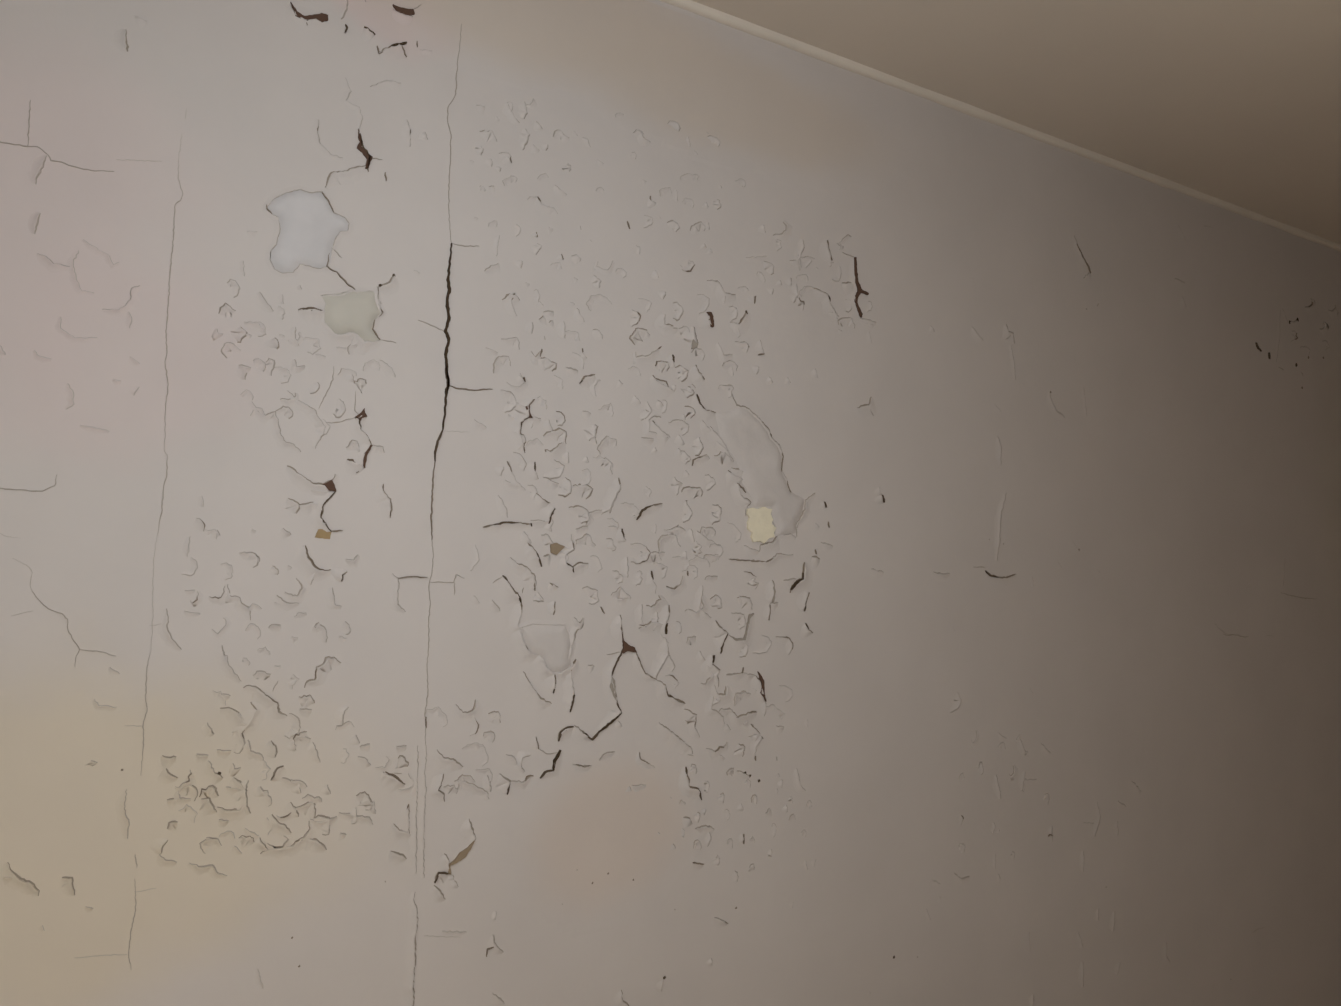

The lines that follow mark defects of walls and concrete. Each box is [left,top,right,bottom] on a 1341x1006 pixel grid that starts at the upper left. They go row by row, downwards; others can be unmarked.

spalling [286,0,433,62]
crack [0,100,187,965]
peeling [211,260,399,419]
crack [248,371,393,610]
peeling [150,496,531,879]
crack [308,24,490,1006]
peeling [472,234,876,871]